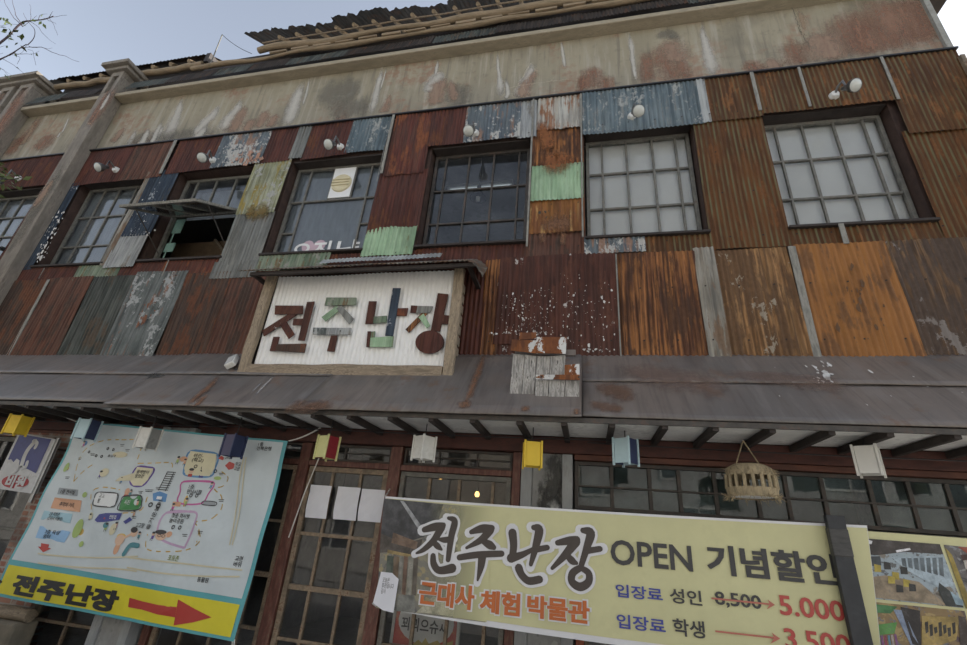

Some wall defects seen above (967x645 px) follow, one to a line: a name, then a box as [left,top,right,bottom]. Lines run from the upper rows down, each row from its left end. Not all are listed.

peeling [491,275,615,352]
peeling [805,361,833,384]